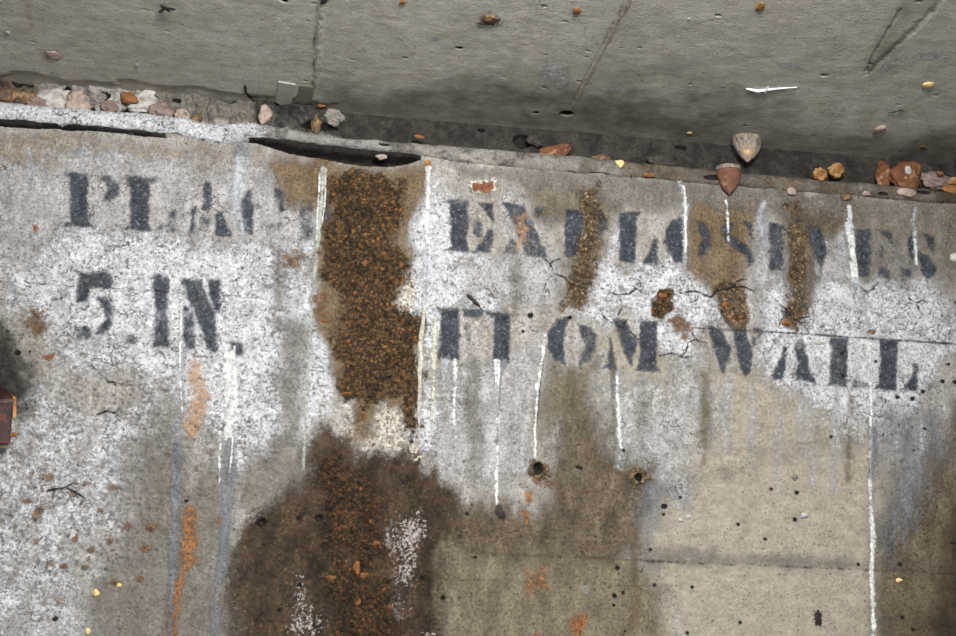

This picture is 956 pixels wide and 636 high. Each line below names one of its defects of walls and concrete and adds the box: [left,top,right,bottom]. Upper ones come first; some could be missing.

rust [469,178,499,194]
crack [542,257,642,340]
crack [659,333,707,358]
rust [185,361,210,437]
water stain [89,146,753,636]
water stain [458,166,956,636]
rust [166,506,200,636]